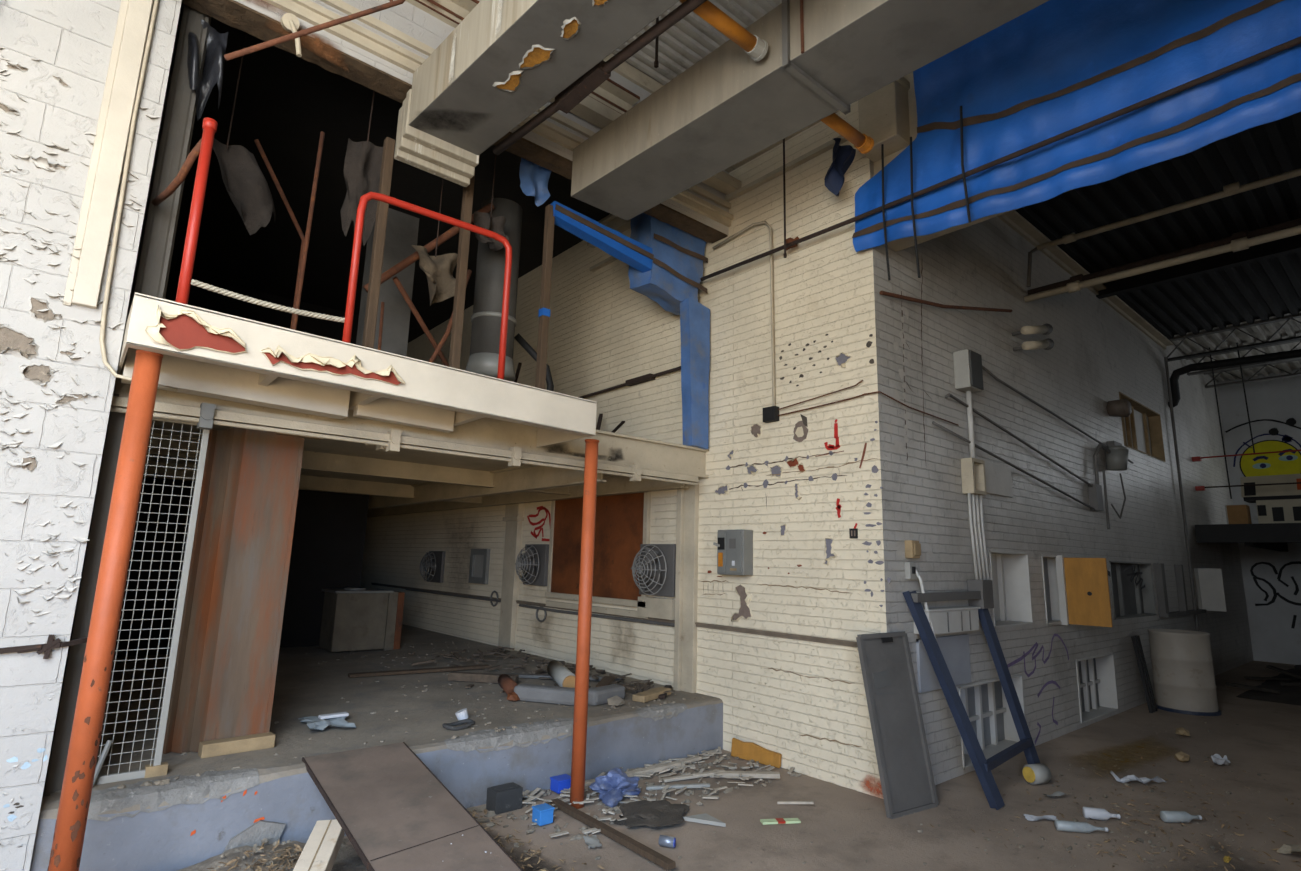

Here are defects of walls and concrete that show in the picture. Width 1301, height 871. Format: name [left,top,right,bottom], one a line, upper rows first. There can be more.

peeling [0,132,96,187]
peeling [109,169,143,250]
peeling [0,196,124,343]
peeling [145,304,405,385]
peeling [0,500,89,624]
peeling [6,748,48,769]
peeling [0,791,33,847]